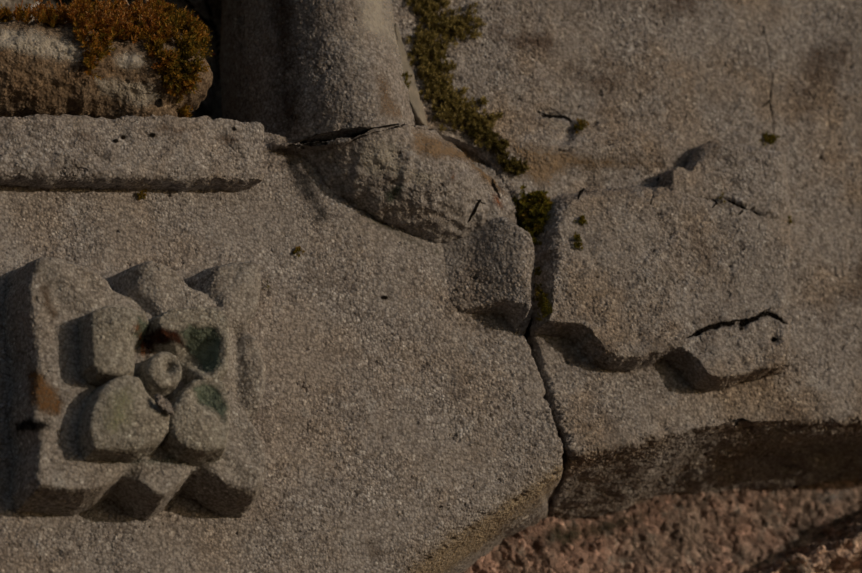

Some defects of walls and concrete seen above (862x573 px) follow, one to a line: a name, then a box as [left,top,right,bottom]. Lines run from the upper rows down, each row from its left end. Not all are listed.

crack [352,123,402,141]
crack [706,198,760,216]
crack [686,307,788,338]